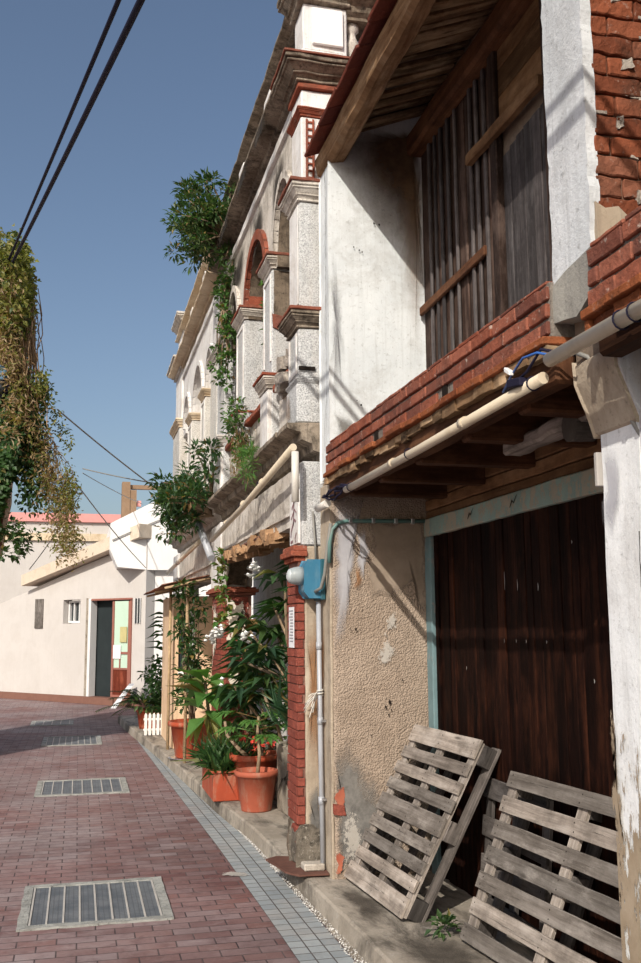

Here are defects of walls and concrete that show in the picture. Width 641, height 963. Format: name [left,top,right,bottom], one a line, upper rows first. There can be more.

spalling [590,0,641,215]
spalling [333,787,346,816]
spalling [336,852,344,875]
peeling [611,713,641,963]